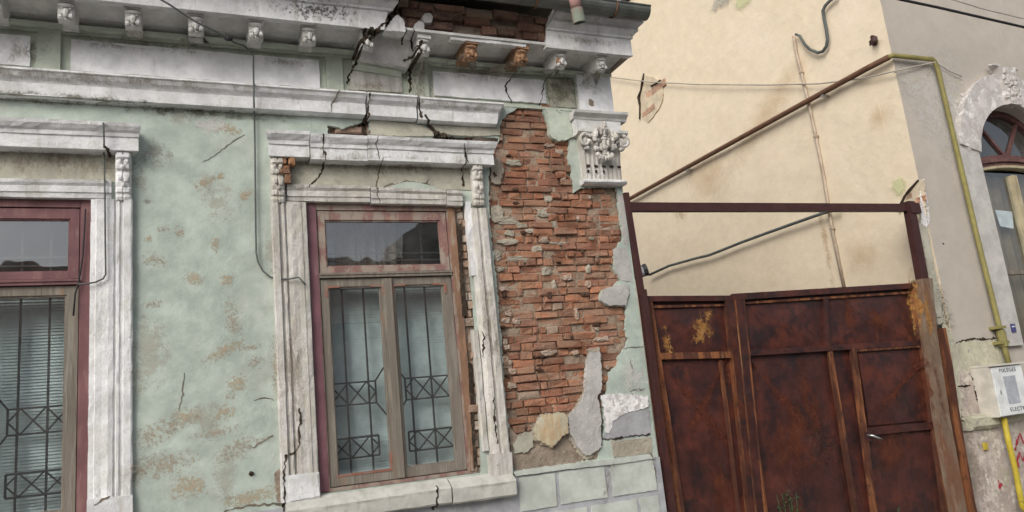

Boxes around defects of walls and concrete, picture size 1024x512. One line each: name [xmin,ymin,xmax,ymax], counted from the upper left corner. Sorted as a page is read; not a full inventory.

crack [309,0,469,203]
spalling [375,0,548,42]
spalling [433,104,652,473]
spalling [900,179,1006,421]
peeling [121,301,280,499]
crack [224,408,302,512]
peeling [219,469,320,508]
crack [431,486,439,510]